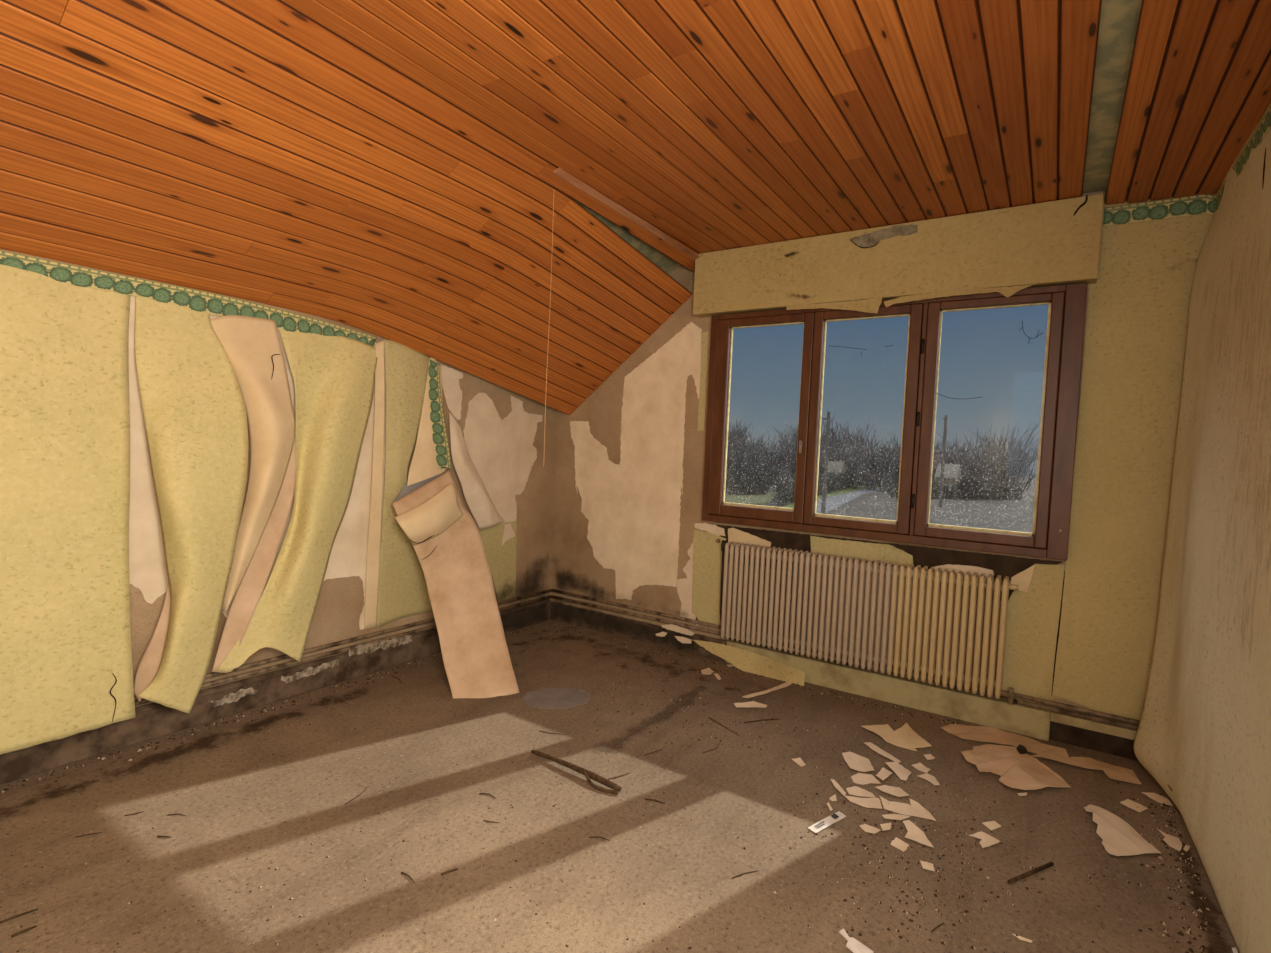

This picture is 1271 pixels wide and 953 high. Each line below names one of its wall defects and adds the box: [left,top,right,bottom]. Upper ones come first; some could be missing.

peeling [849,224,918,248]
damp [499,563,697,650]
peeling [281,635,413,683]
peeling [210,687,257,707]